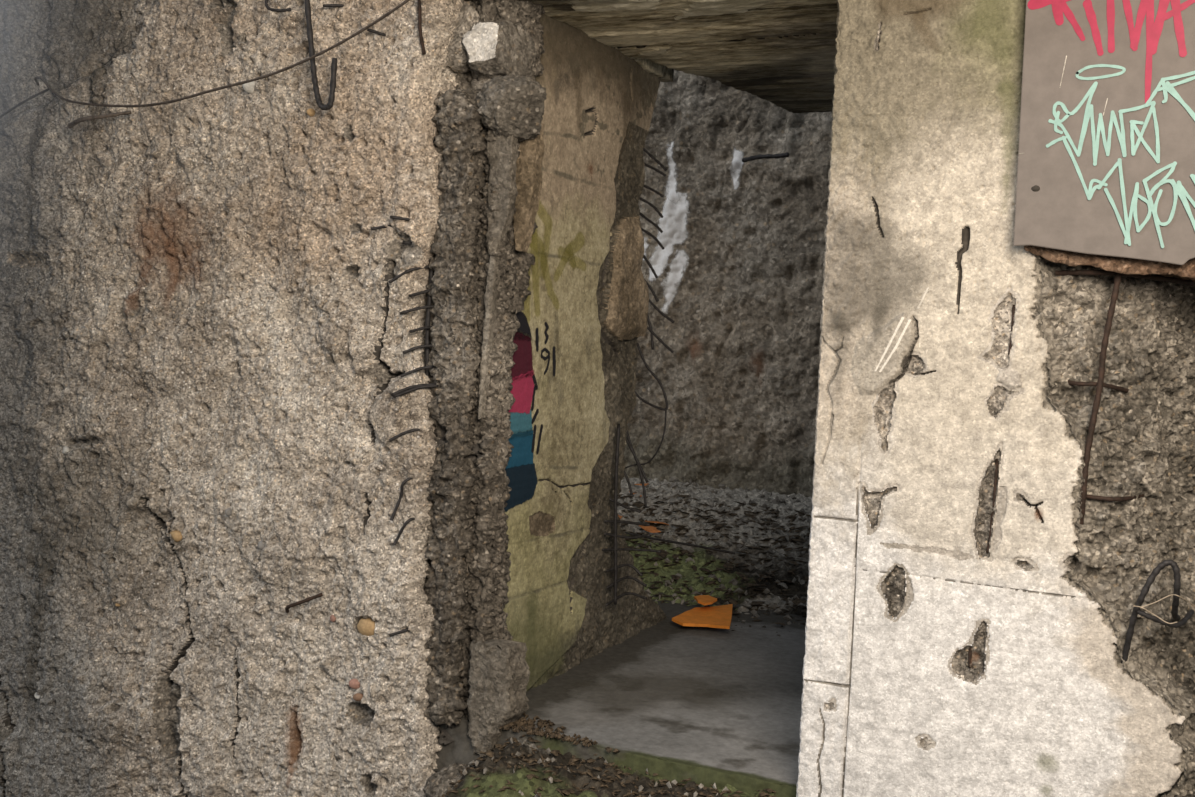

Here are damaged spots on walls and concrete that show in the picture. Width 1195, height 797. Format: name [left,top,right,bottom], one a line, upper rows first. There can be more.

peeling [674,0,775,20]
spalling [366,361,399,388]
spalling [382,230,434,383]
spalling [527,119,735,691]
efflorescence [643,142,689,314]
crack [822,336,844,465]
crack [139,497,195,685]
crack [805,474,1075,797]
spalling [859,442,1029,622]
spalling [948,618,991,685]
spalling [976,245,1195,797]
crack [178,739,188,797]